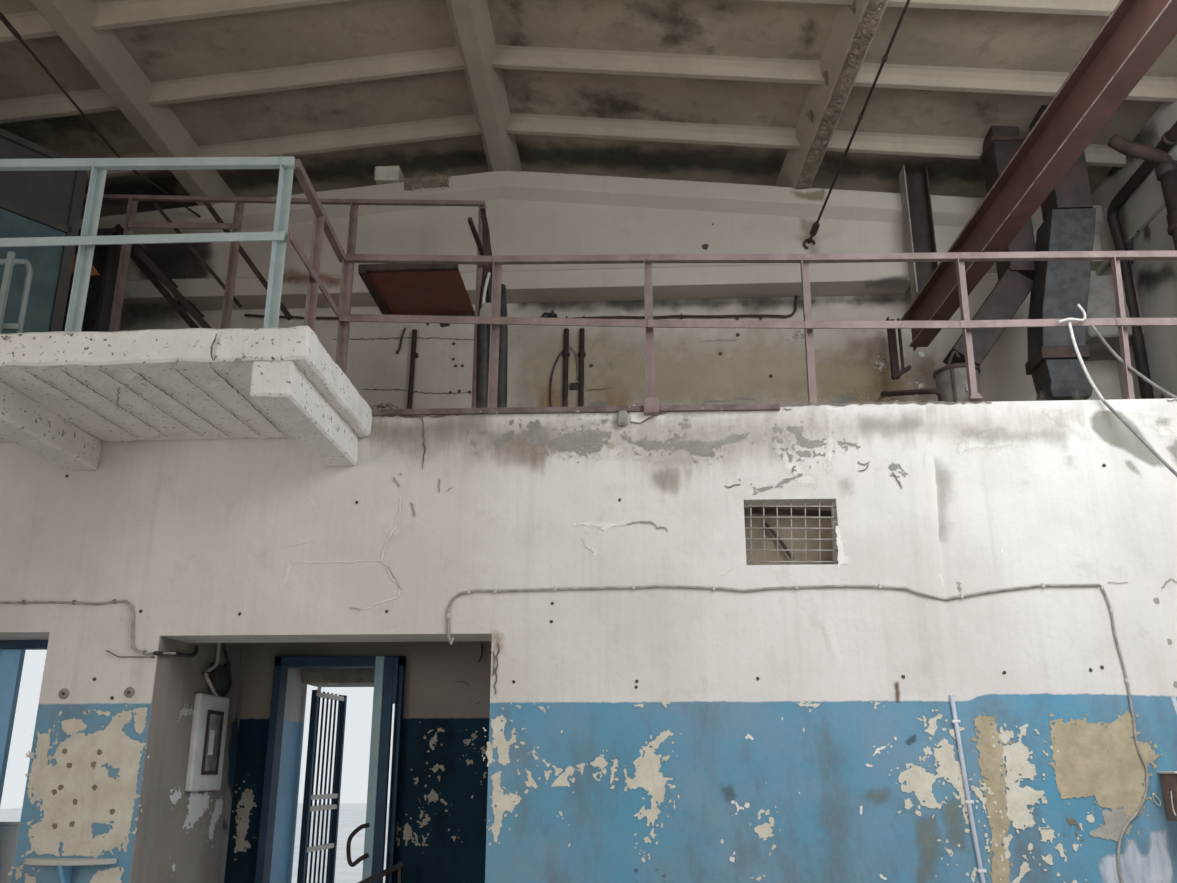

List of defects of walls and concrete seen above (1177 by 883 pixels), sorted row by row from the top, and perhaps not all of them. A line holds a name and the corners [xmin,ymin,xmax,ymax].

crack [284,389,472,612]
flaking render [465,405,861,495]
damp [535,341,903,490]
flaking render [886,459,908,478]
damp [958,429,1029,454]
damp [1045,409,1177,470]
peeling [8,700,149,883]
peeling [396,728,452,846]
peeling [460,703,680,863]
peeling [749,805,781,855]
peeling [889,709,1095,883]